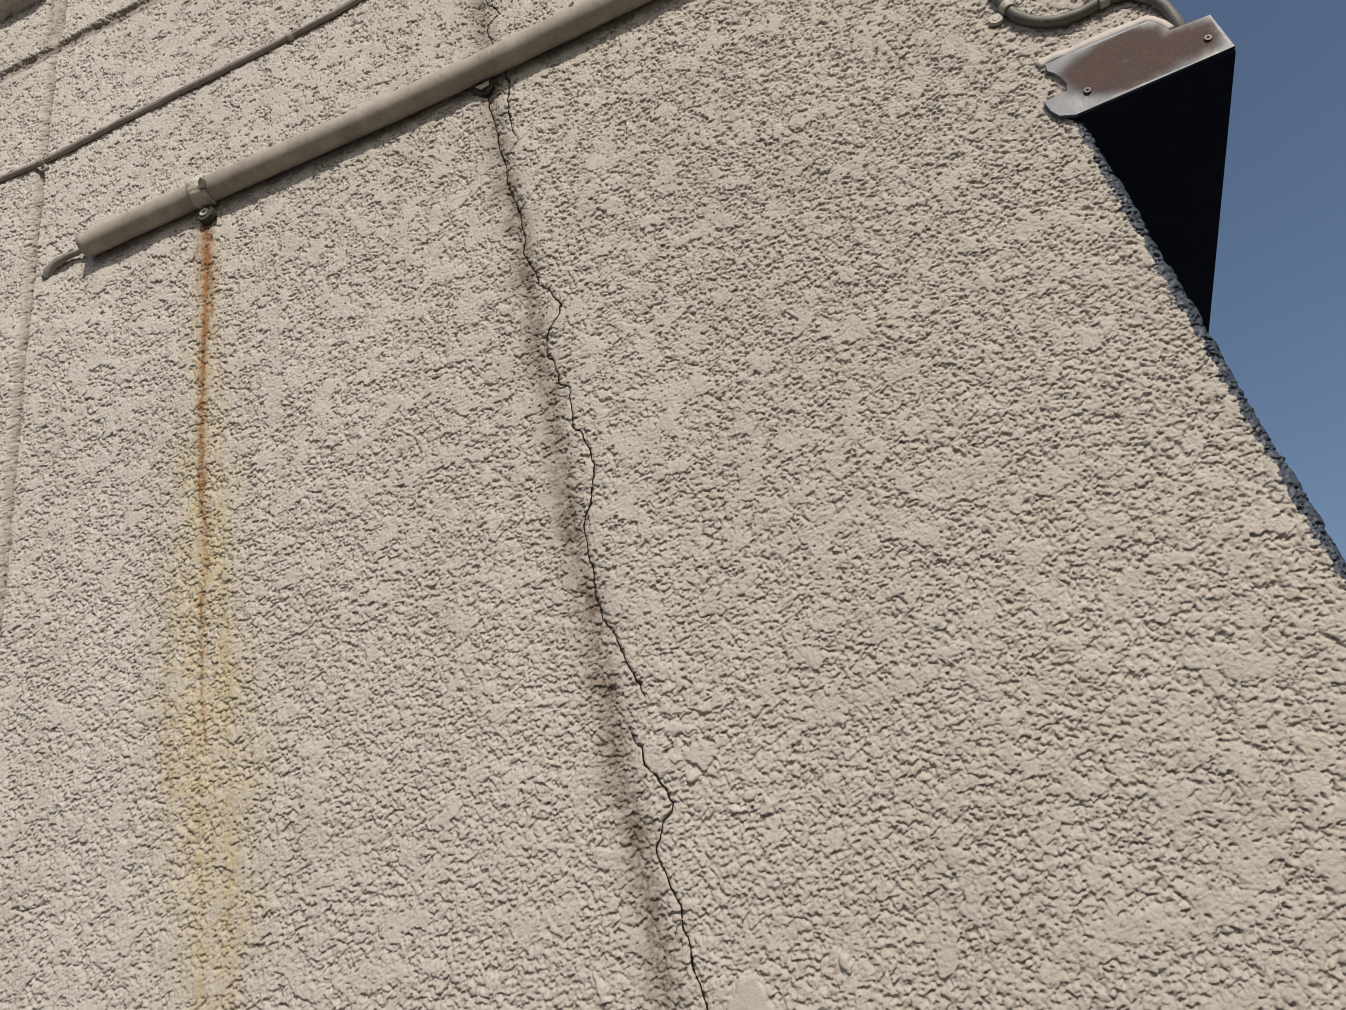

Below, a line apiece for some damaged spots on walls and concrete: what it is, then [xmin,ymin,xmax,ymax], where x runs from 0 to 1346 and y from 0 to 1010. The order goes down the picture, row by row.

corrosion [198,224,212,486]
crack [486,1,646,698]
crack [630,729,708,1010]